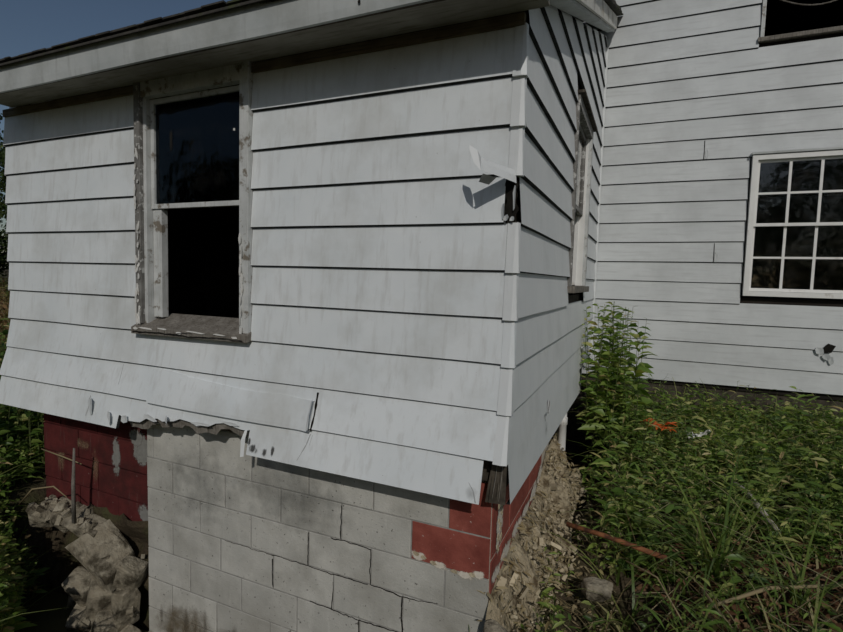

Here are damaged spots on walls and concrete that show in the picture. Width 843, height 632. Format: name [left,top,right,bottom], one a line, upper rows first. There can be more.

peeling [133,221,166,330]
peeling [176,233,243,339]
peeling [112,438,120,476]
peeling [129,429,148,466]
spalling [412,466,542,583]